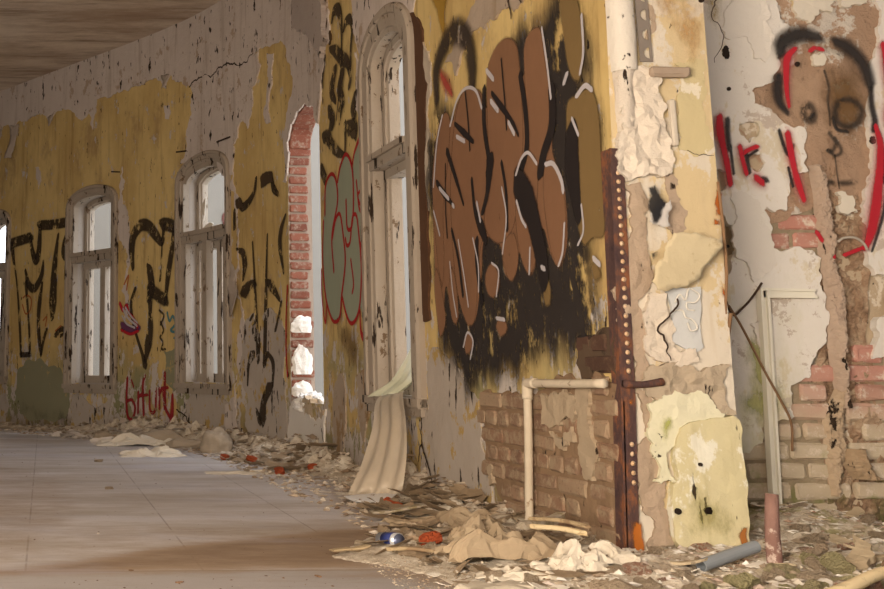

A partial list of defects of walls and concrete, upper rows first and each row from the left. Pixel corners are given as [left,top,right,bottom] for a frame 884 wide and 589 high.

crack [189,53,253,88]
flaking render [445,0,524,76]
crack [711,0,724,63]
flaking render [717,0,879,282]
flaking render [0,0,347,455]
flaking render [418,42,737,552]
corrosion [622,378,665,388]
flaking render [743,428,768,508]
flaking render [778,345,884,512]
corrosion [633,523,644,551]